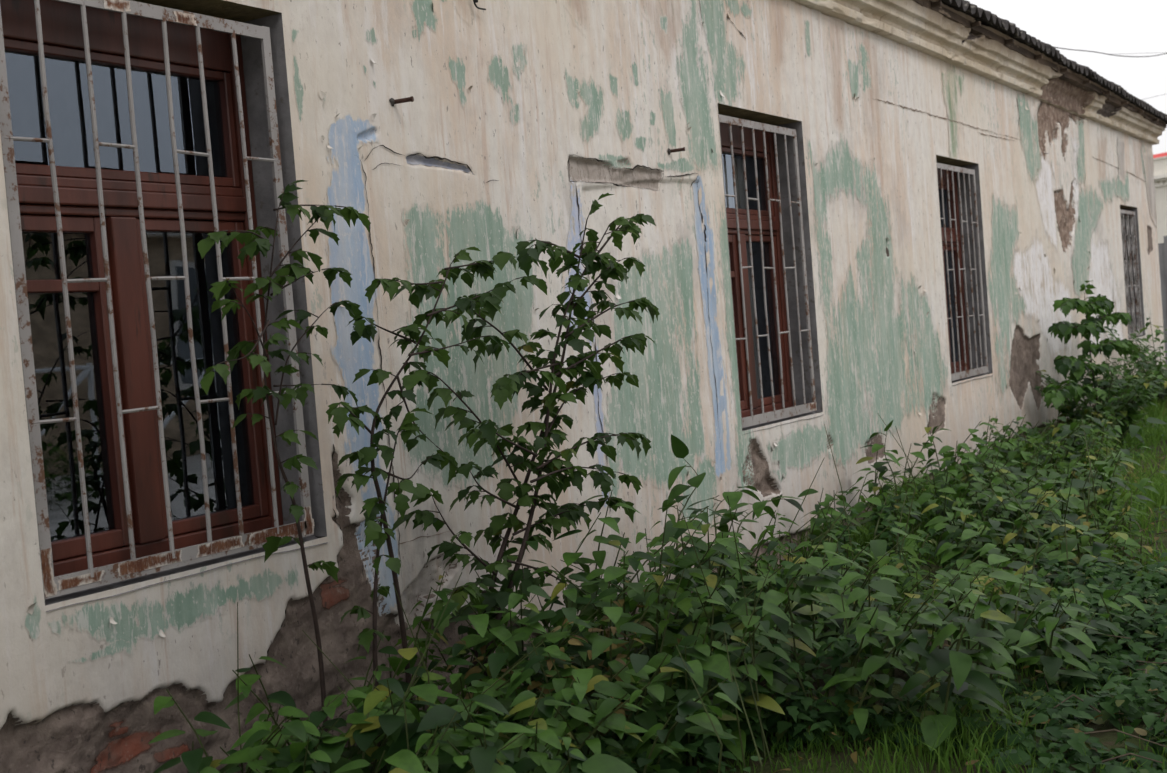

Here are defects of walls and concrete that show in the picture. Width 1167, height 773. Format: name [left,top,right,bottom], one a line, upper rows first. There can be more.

corrosion [104,0,131,12]
corrosion [174,11,197,26]
peeling [291,28,305,122]
peeling [363,27,377,88]
spalling [406,155,473,174]
peeling [562,0,949,531]
peeling [987,91,1130,410]
peeling [321,113,399,616]
corrosion [197,506,315,558]
corrosion [40,548,104,597]
peeling [22,564,299,664]